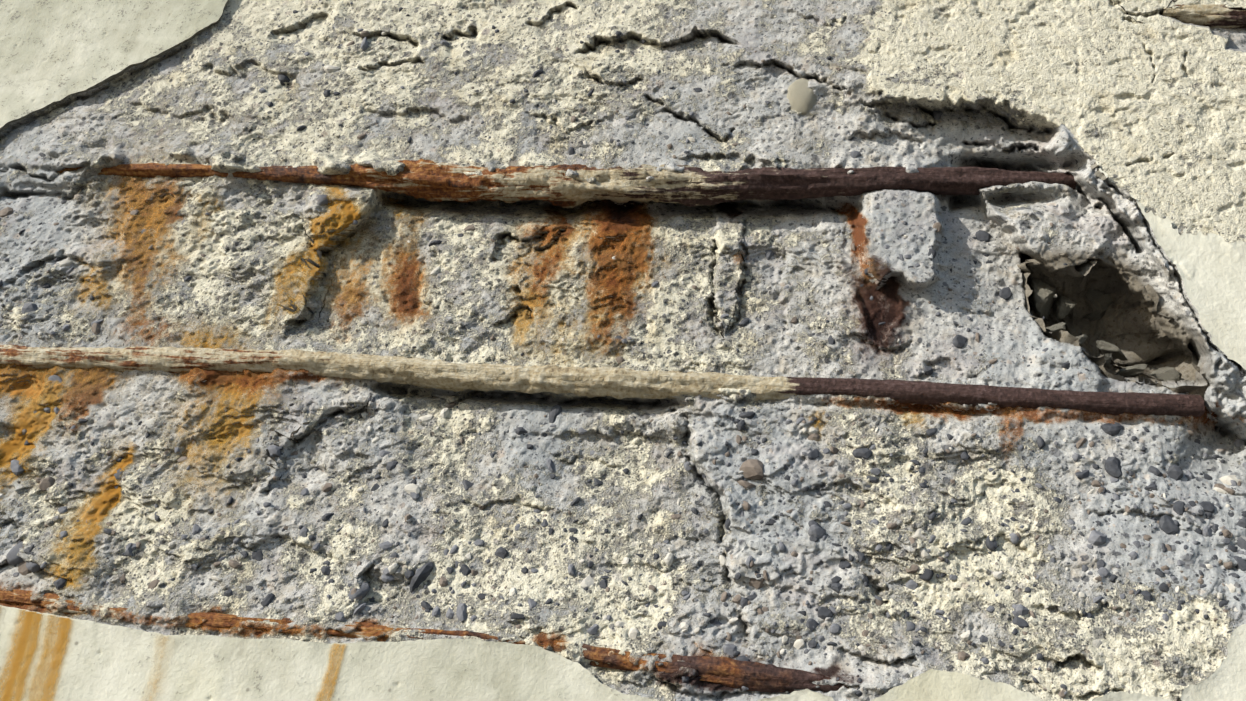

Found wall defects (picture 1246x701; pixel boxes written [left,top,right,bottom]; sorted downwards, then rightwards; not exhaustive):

spalling [0,13,223,132]
peeling [857,0,1246,244]
corrosion [276,187,423,328]
corrosion [510,199,653,343]
corrosion [834,203,909,354]
spalling [1031,278,1056,319]
corrosion [0,363,115,488]
corrosion [809,397,1166,447]
corrosion [0,586,74,701]
spalling [793,635,805,650]
spalling [1012,617,1029,628]
spalling [1012,604,1036,618]